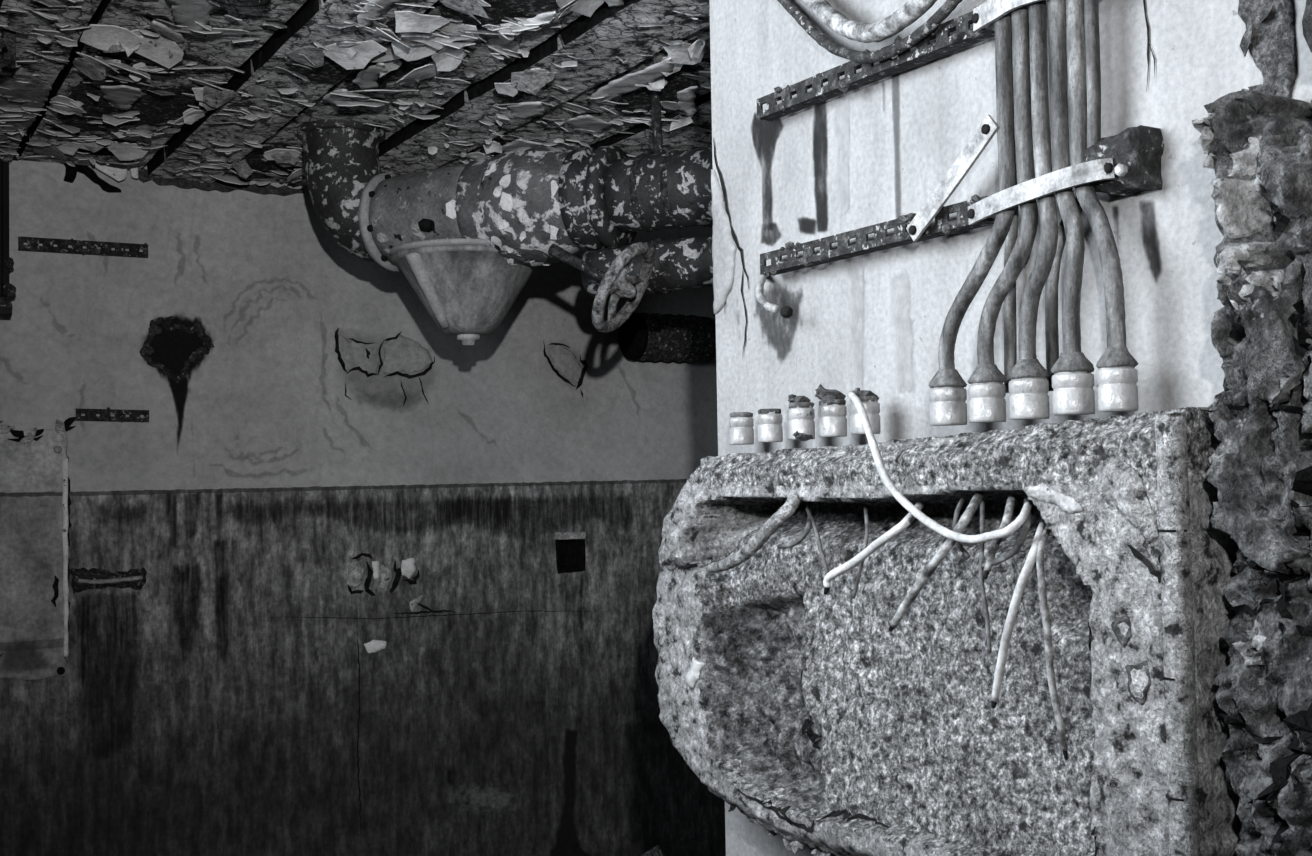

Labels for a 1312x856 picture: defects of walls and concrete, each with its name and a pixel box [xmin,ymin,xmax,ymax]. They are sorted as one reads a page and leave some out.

peeling [1238,0,1297,98]
spalling [0,0,712,266]
corrosion [752,85,827,251]
corrosion [1141,202,1161,281]
peeling [0,417,77,632]
spalling [1024,483,1083,513]
peeling [1210,501,1312,571]
peeling [347,553,445,613]
damp [3,643,46,671]
damp [685,657,705,690]
spalling [1125,660,1151,705]
damp [550,730,588,856]